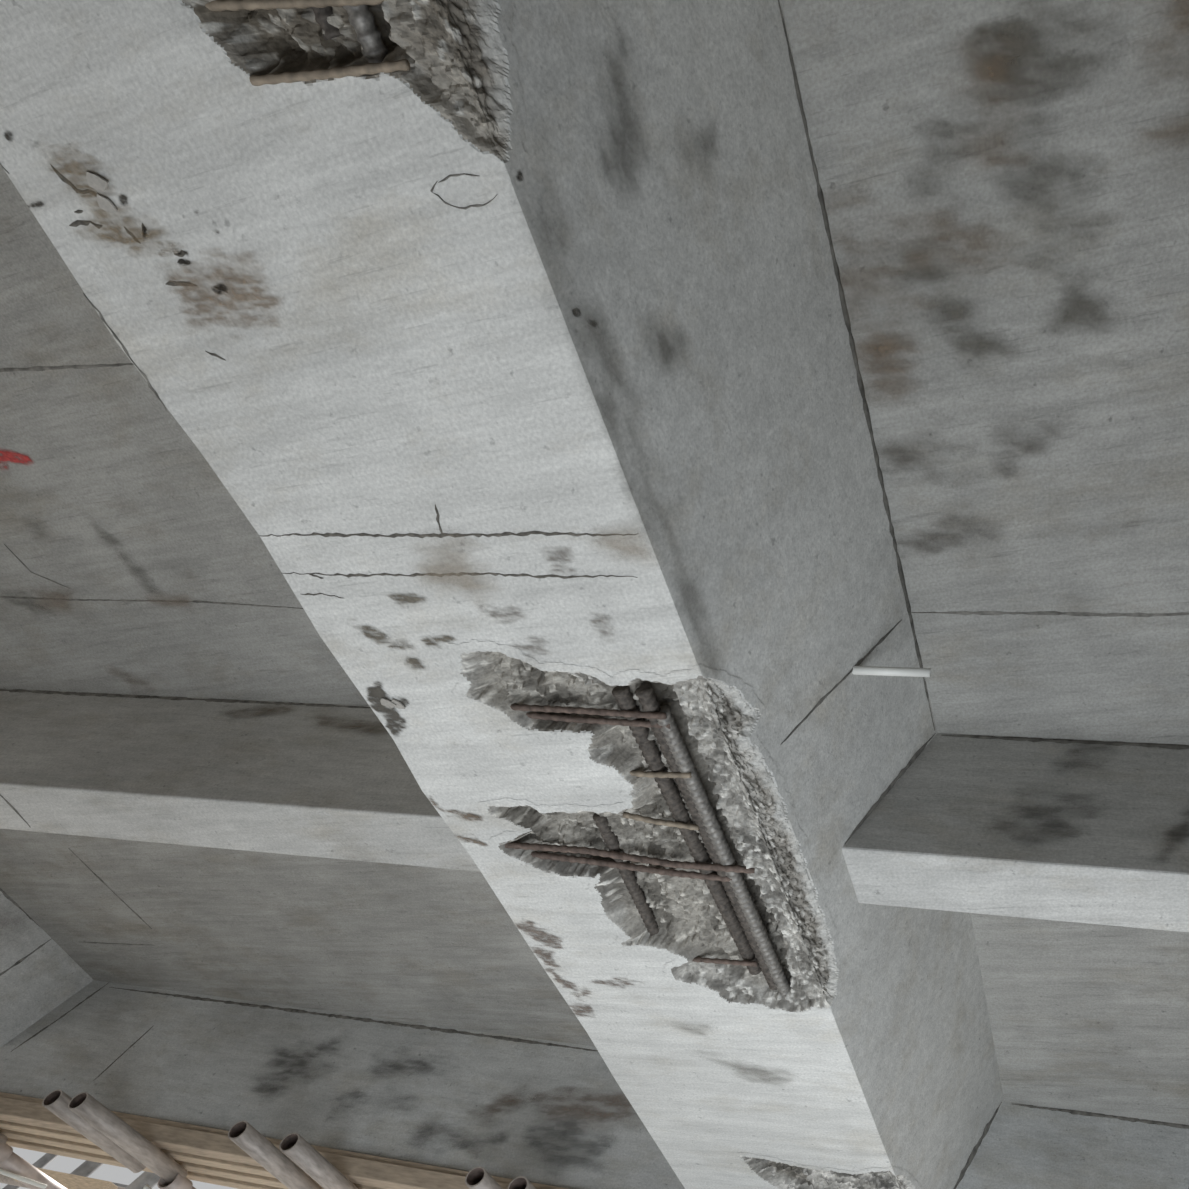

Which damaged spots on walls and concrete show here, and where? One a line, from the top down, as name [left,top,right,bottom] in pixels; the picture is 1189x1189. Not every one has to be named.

water stain [976,20,1079,91]
spalling [159,0,528,182]
crack [263,504,639,538]
peeling [390,594,424,603]
crack [283,572,637,598]
spalling [362,626,845,1019]
spalling [734,1152,923,1189]